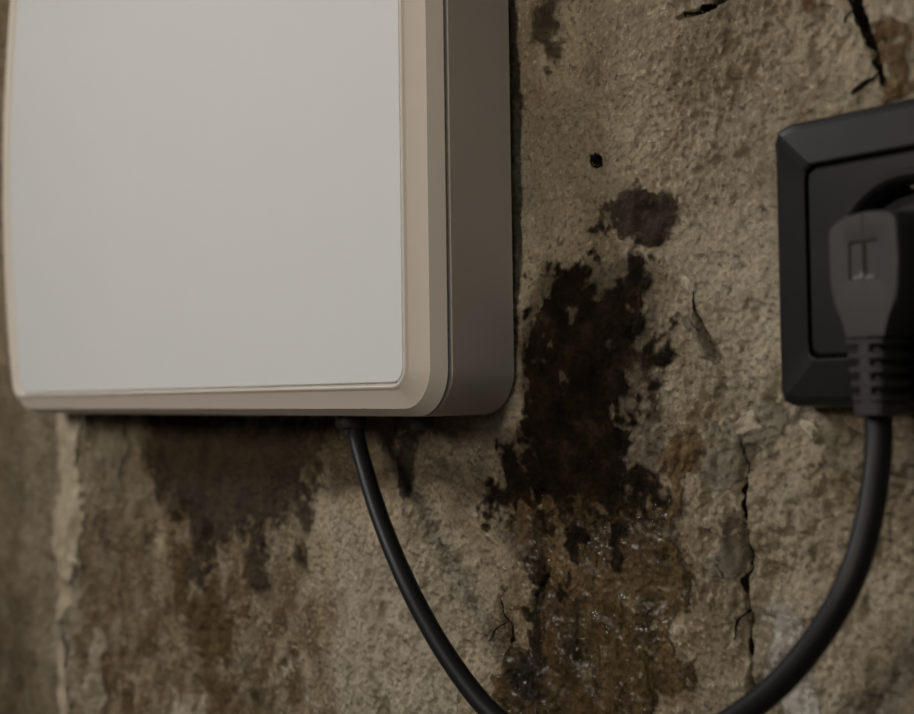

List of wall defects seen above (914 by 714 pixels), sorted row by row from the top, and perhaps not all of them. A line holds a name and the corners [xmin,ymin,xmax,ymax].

crack [683,0,725,18]
crack [844,0,887,95]
damp [476,180,697,714]
damp [329,516,459,714]
crack [733,454,774,686]
damp [761,597,804,676]
damp [781,677,819,714]